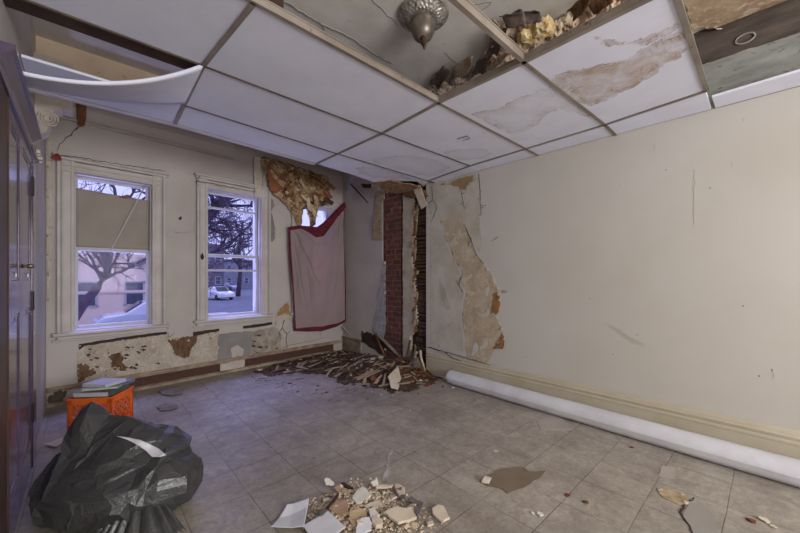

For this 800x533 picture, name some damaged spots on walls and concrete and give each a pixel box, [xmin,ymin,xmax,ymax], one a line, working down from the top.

flaking render [492,0,626,53]
flaking render [683,0,786,32]
flaking render [427,37,515,96]
peeling [253,157,269,197]
peeling [361,173,505,365]
peeling [76,331,219,383]